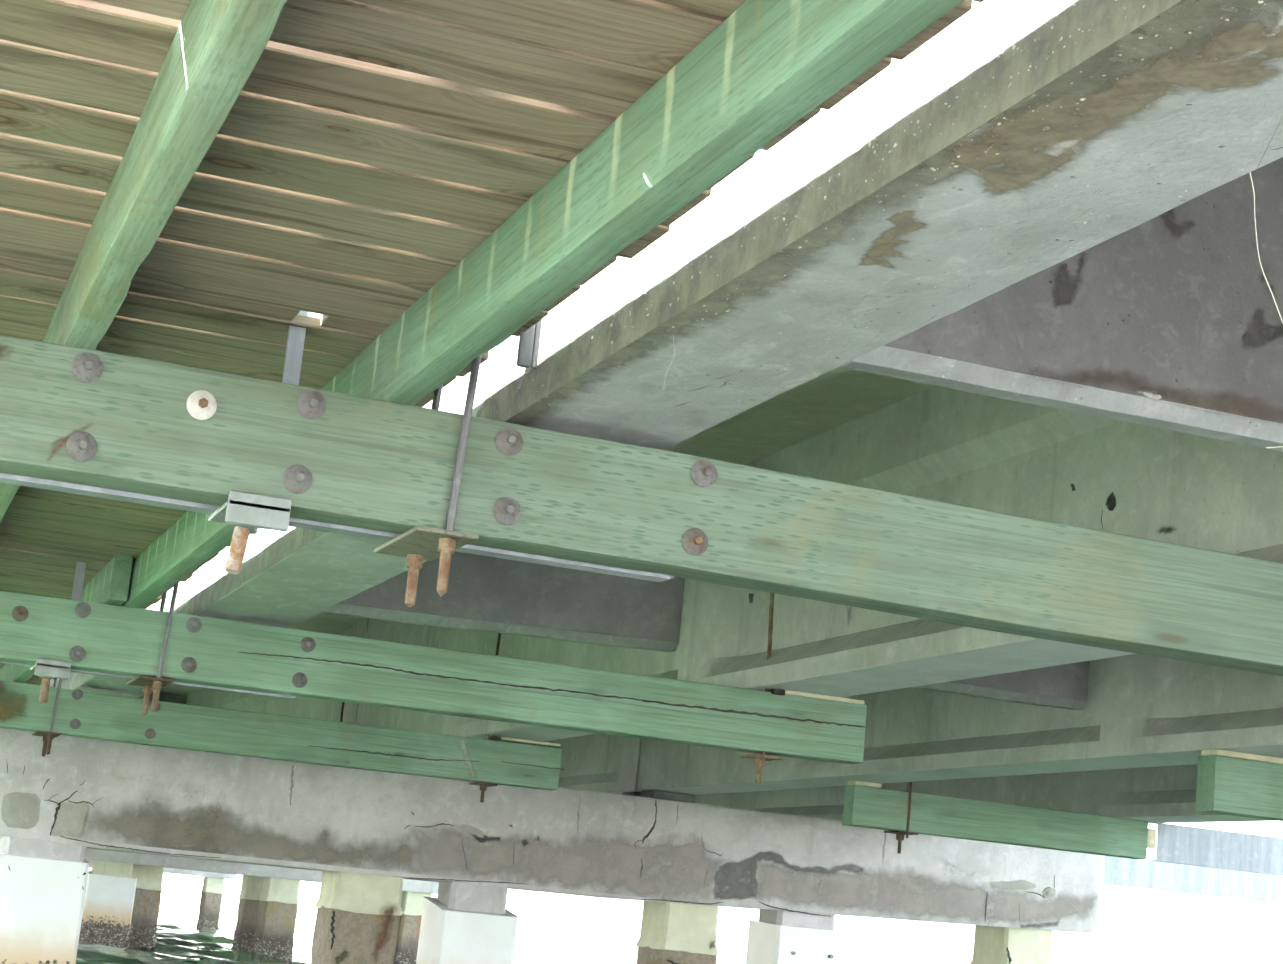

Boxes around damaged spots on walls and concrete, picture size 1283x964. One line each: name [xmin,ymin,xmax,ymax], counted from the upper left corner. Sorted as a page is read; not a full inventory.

water stain [948,16,1283,195]
water stain [859,211,927,268]
water stain [1162,209,1194,237]
water stain [1053,257,1084,306]
water stain [1243,311,1283,346]
crack [7,765,221,858]
corrosion [373,907,394,960]
water stain [89,805,1094,927]
crack [635,800,723,905]
crack [758,871,830,917]
crack [1006,875,1055,964]